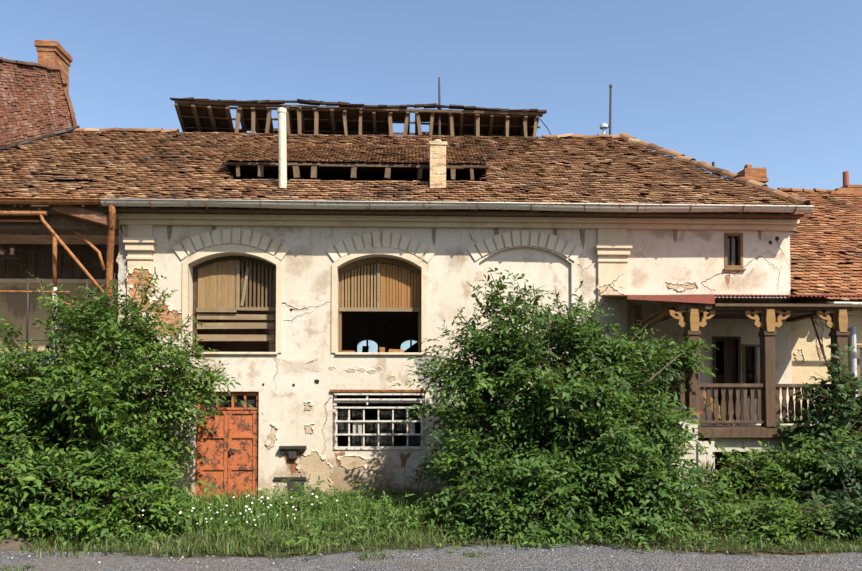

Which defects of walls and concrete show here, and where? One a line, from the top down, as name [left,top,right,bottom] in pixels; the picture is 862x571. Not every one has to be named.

crack [665,241,789,292]
crack [282,302,331,323]
crack [320,396,332,458]
peeling [295,449,387,497]